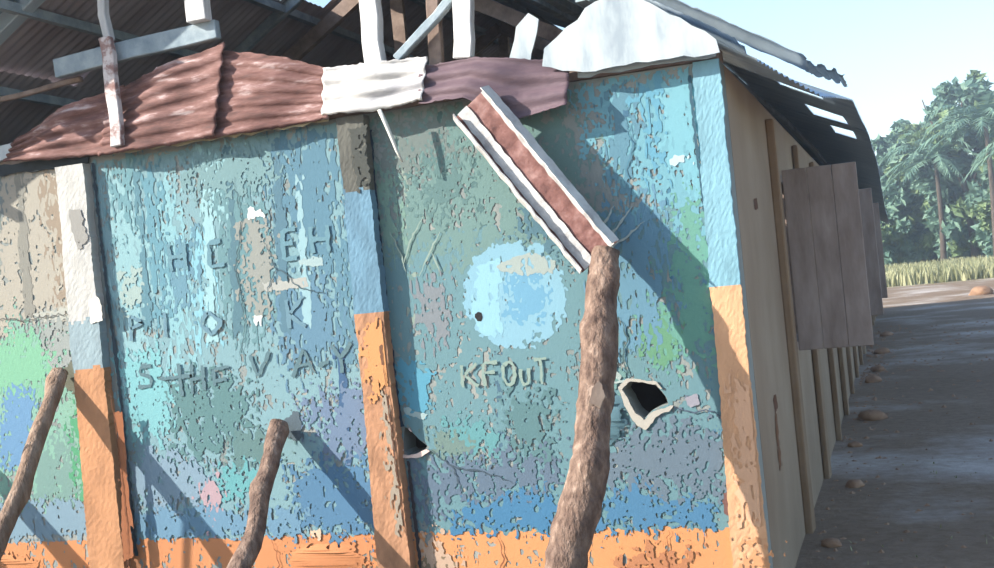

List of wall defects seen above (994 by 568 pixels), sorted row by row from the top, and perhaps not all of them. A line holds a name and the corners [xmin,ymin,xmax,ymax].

crack [0,313,67,321]
peeling [0,169,88,514]
corrosion [3,41,329,162]
peeling [88,101,588,568]
crack [370,130,387,295]
crack [383,339,512,568]
corrosion [418,57,570,119]
peeling [519,66,761,533]